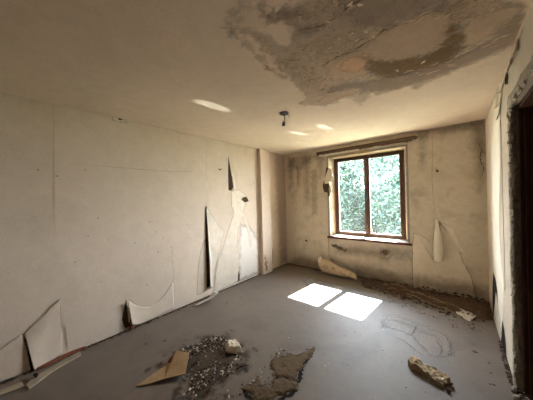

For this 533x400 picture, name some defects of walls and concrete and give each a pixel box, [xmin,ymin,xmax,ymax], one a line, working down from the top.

damp [260,0,521,91]
peeling [214,190,251,292]
peeling [323,167,334,196]
peeling [412,219,475,299]
spalling [485,29,533,391]